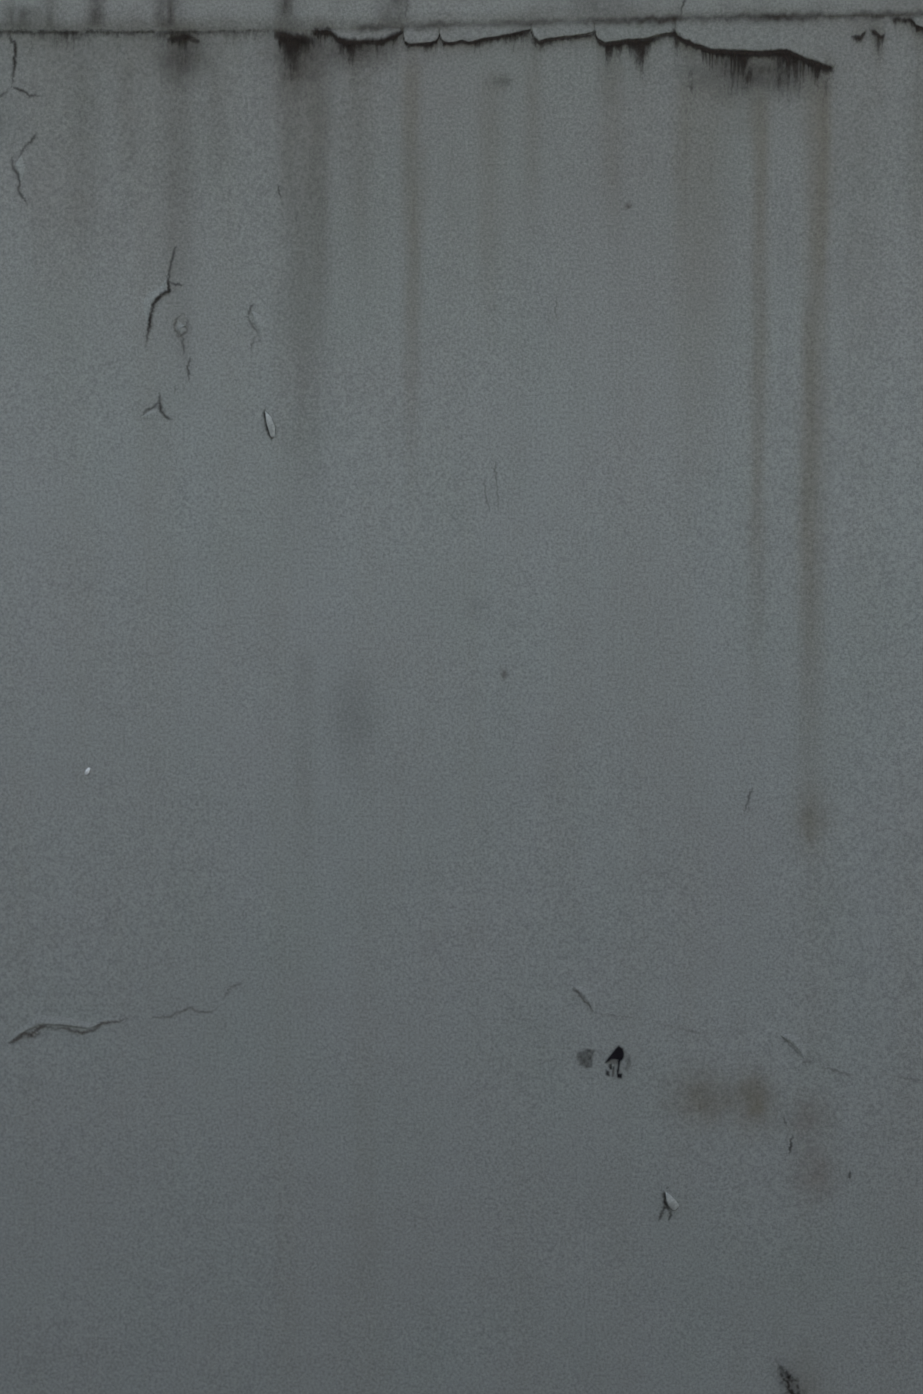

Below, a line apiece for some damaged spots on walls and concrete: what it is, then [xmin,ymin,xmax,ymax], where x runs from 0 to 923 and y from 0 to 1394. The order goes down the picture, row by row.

crack [11,40,27,93]
peeling [314,15,836,69]
water stain [854,30,884,46]
crack [12,137,35,196]
crack [143,253,189,372]
crack [8,1015,110,1042]